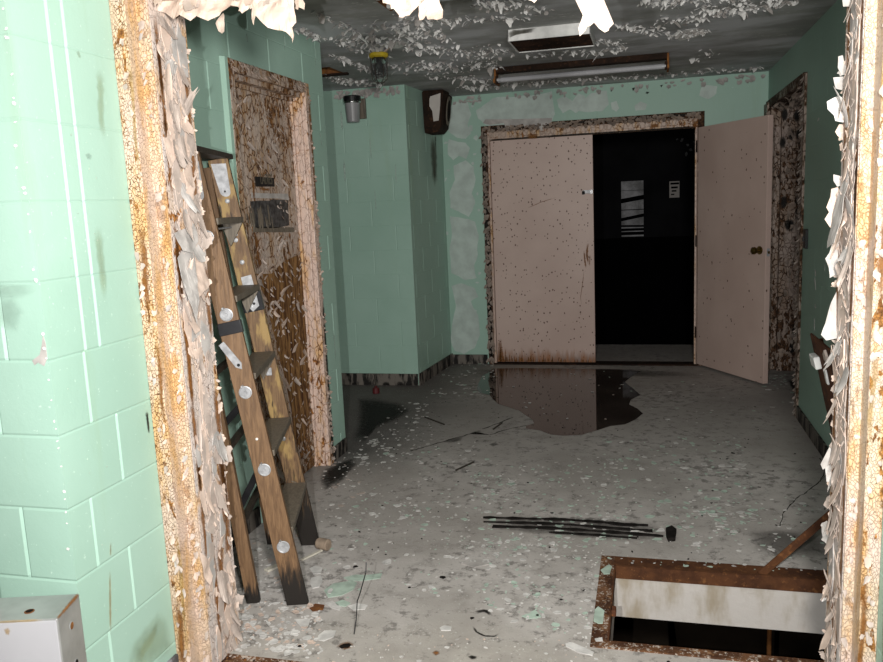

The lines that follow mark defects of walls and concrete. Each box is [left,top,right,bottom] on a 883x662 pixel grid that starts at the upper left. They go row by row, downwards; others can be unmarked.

peeling [134,0,799,662]
spalling [565,0,883,662]
crack [779,458,826,526]